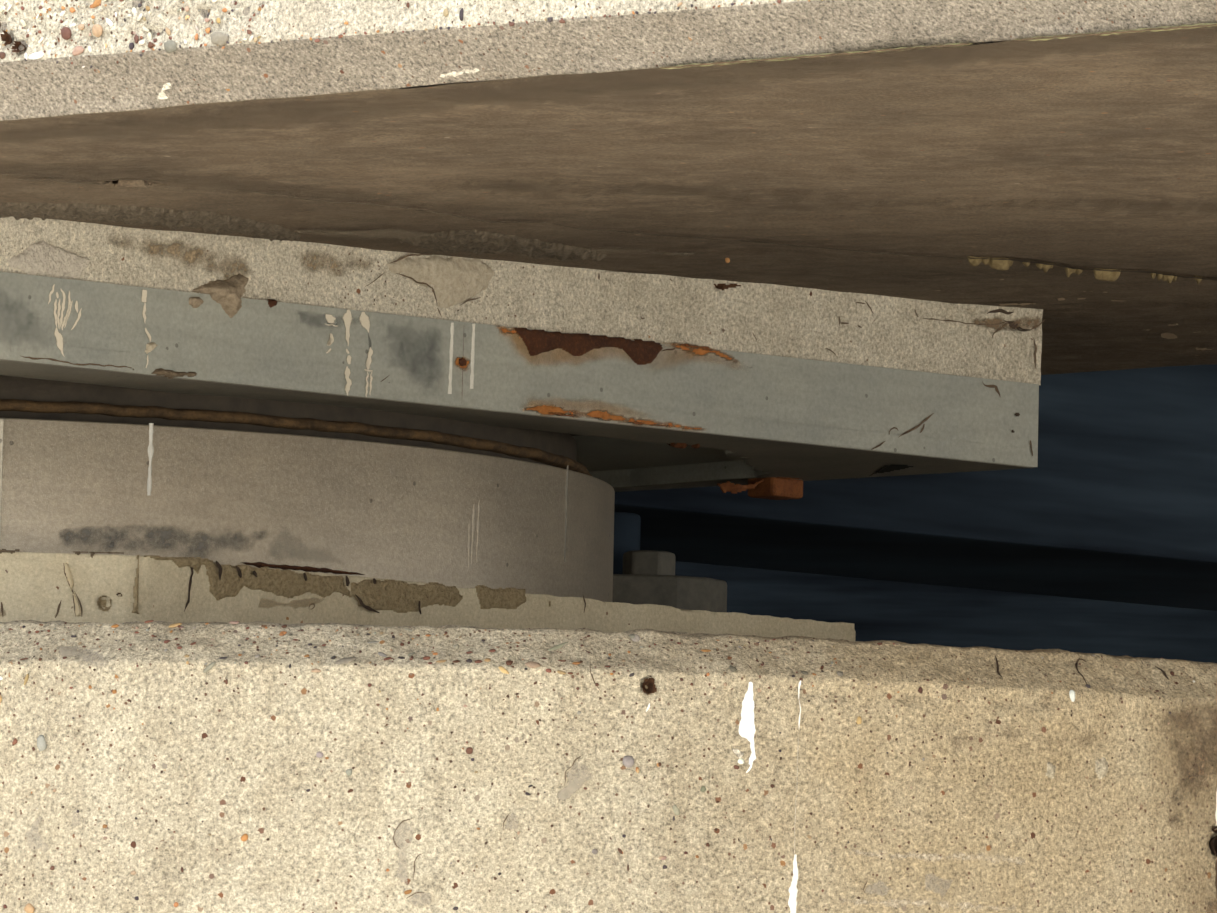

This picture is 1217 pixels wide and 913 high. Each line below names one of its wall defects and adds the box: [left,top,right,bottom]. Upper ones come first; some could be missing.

damp [48,284,82,330]
damp [326,324,373,397]
corrosion [500,328,734,365]
corrosion [525,405,704,449]
corrosion [717,477,801,494]
spalling [0,551,657,695]
spalling [670,637,815,686]
spalling [792,645,857,687]
efflorescence [733,682,756,773]
damp [1172,708,1217,785]
efflorescence [788,794,799,913]
damp [1208,860,1217,913]